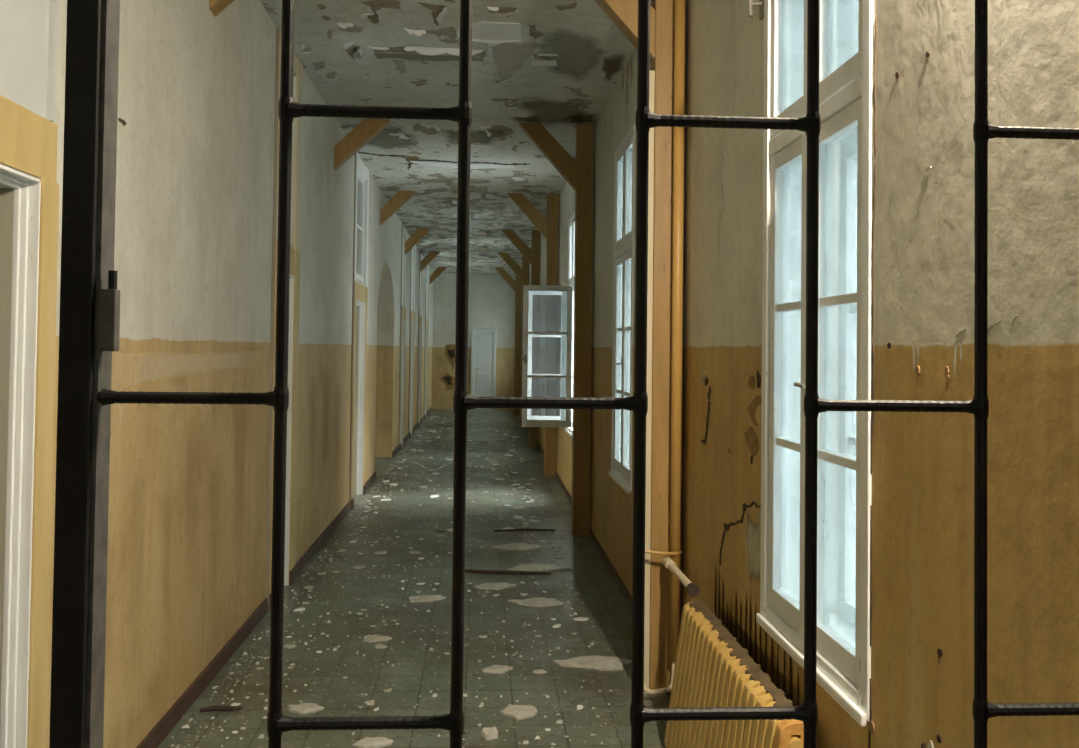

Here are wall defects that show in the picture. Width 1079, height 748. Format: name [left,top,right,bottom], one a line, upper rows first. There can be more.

peeling [317,0,559,85]
leakage [541,34,621,79]
peeling [389,123,442,140]
peeling [469,186,515,262]
crack [719,501,761,566]